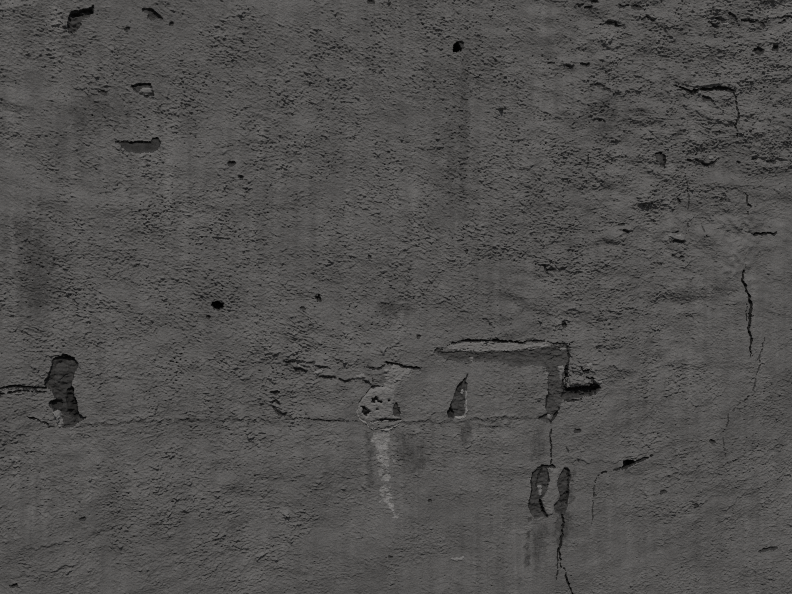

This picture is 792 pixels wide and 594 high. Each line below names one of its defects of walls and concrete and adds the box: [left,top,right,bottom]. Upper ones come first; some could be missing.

spalling [67,5,94,34]
crack [675,84,740,138]
spalling [115,137,161,154]
crack [0,384,52,396]
spalling [44,353,86,428]
crack [80,361,421,427]
peeling [356,364,412,431]
spalling [434,338,603,423]
crack [723,269,765,460]
efflorescence [371,428,399,518]
spalling [528,464,572,519]
crack [556,514,574,594]